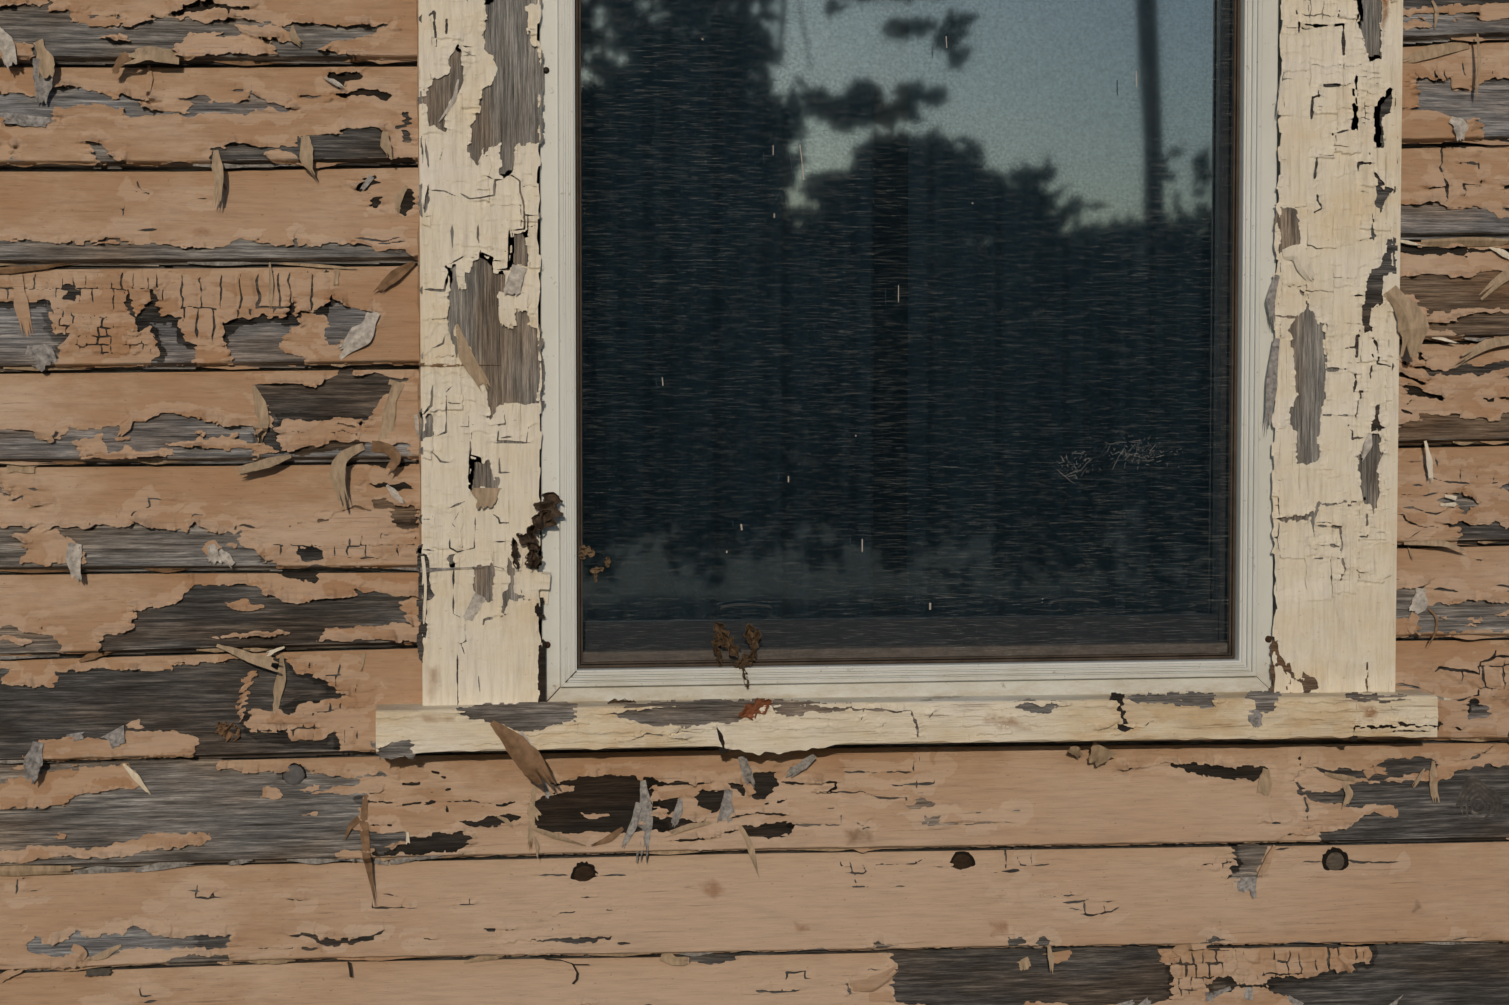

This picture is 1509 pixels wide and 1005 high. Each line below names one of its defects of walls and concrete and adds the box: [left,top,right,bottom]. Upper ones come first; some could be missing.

peeling [0,0,544,228]
peeling [1263,0,1509,592]
crack [0,131,542,705]
peeling [0,223,1034,983]
peeling [1396,573,1509,649]
peeling [1004,629,1509,898]
peeling [835,925,1179,1005]
peeling [1193,925,1238,945]
crack [1167,943,1378,1005]
peeling [1202,942,1509,1005]